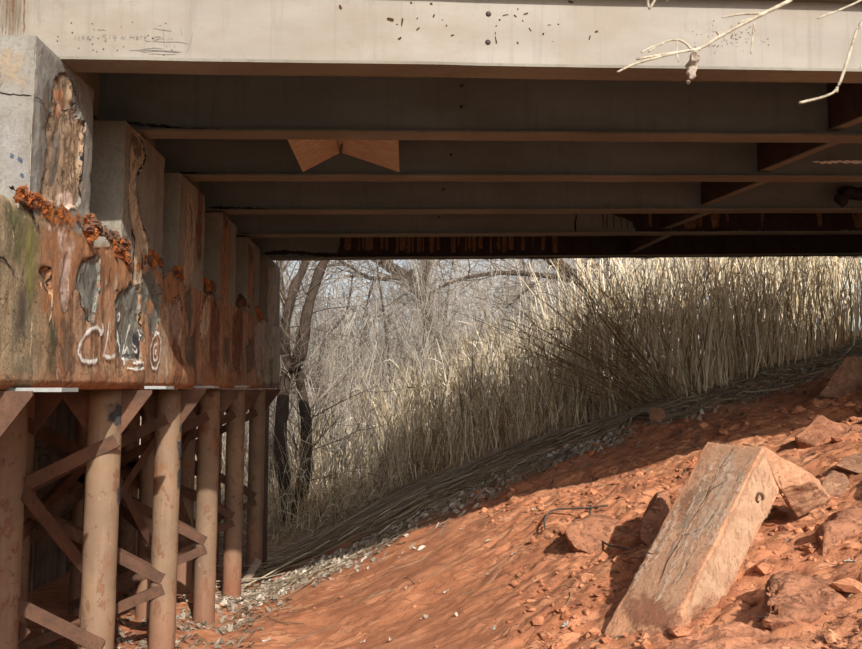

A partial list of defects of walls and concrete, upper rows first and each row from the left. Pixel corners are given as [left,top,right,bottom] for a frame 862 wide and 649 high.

crack [0,92,73,124]
spalling [40,73,86,210]
spalling [39,252,101,382]
rust [9,185,133,375]
spalling [115,129,162,362]
rust [144,248,185,283]